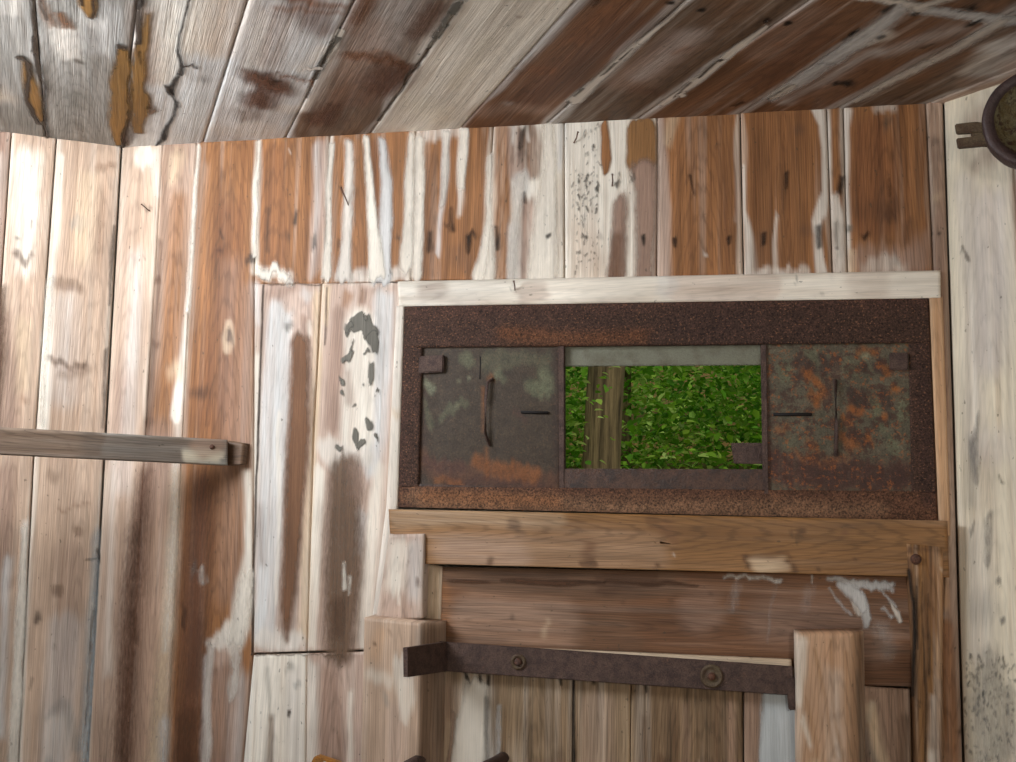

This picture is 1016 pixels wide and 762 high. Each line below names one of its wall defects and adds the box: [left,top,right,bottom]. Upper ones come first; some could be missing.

crack [155,0,198,146]
peeling [341,311,379,392]